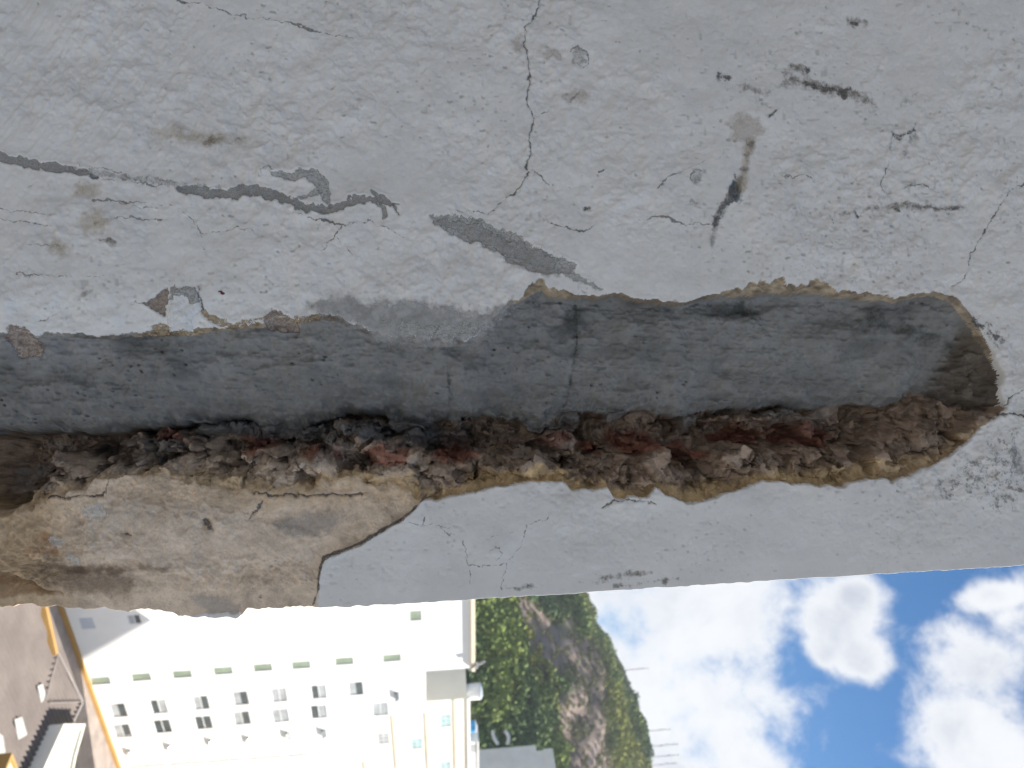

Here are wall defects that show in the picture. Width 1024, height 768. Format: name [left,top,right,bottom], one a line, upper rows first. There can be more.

crack [488,3,545,214]
peeling [0,151,164,187]
peeling [176,166,399,219]
damp [712,176,743,227]
spalling [0,210,1004,616]